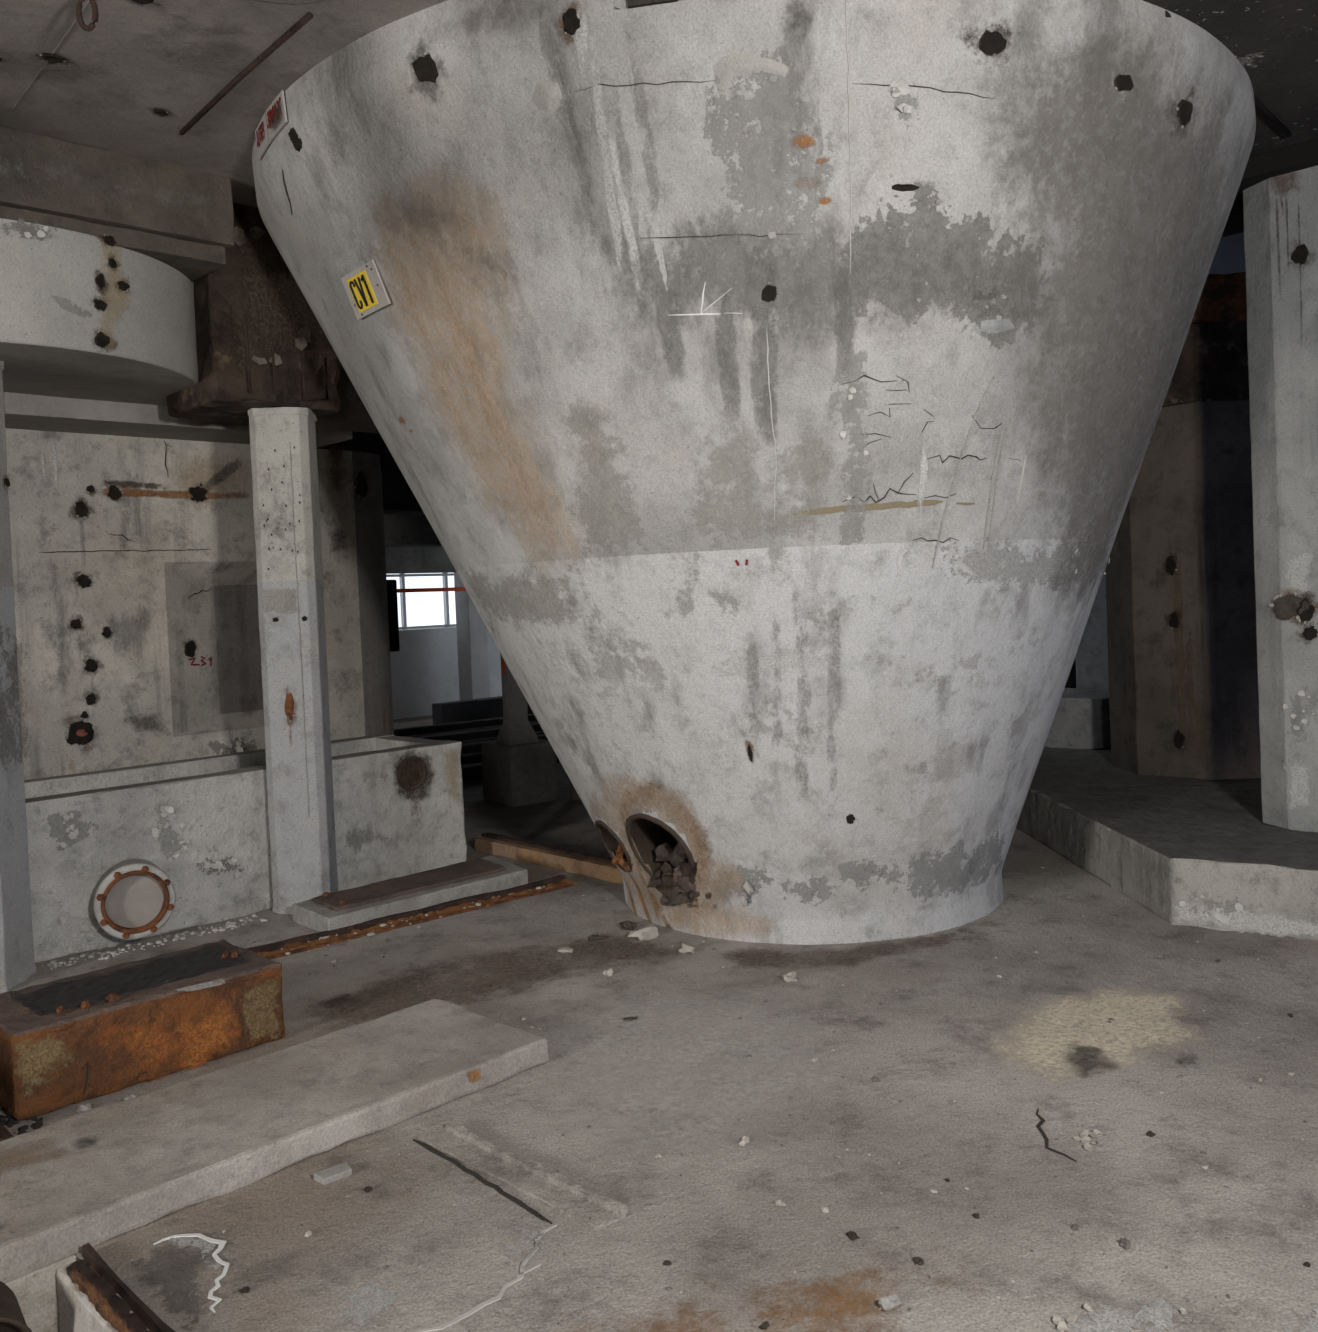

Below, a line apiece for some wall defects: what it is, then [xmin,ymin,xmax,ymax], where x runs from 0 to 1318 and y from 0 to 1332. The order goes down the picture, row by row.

damp [574,13,1036,440]
flaking render [51,234,130,318]
spalling [93,331,117,351]
rust [103,460,244,501]
crack [793,375,1018,543]
damp [919,447,928,513]
rust [592,783,740,928]
rust [14,1034,72,1097]
rust [100,980,280,1080]
crack [1036,1108,1077,1162]
peeling [153,1233,229,1313]
rust [760,1271,879,1332]